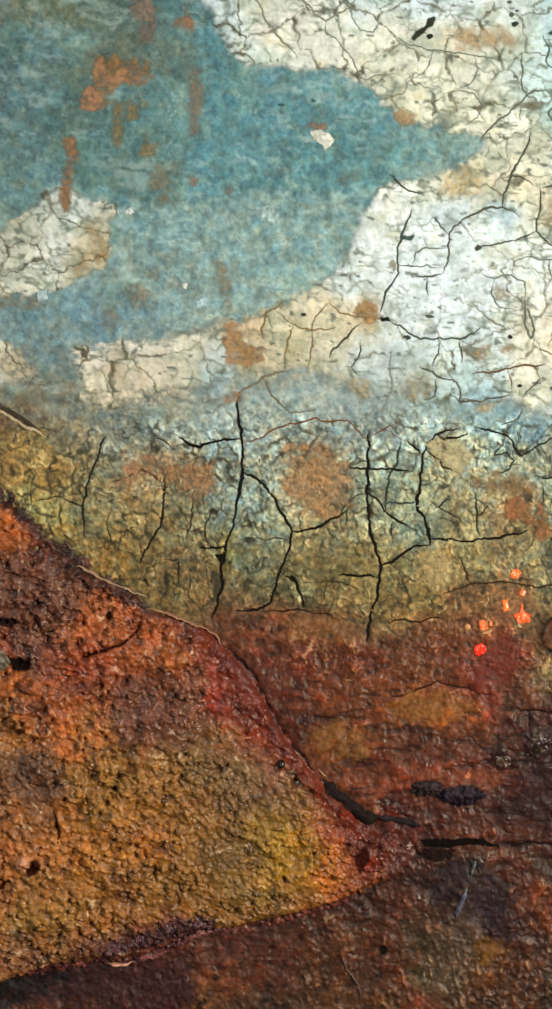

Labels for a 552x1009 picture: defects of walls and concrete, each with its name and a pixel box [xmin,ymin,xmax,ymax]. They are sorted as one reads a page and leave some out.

crack [255,0,297,57]
crack [302,0,393,81]
corrosion [114,104,147,145]
corrosion [60,137,77,210]
peeling [37,290,48,302]
crack [30,36,552,642]
corrosion [315,720,368,759]